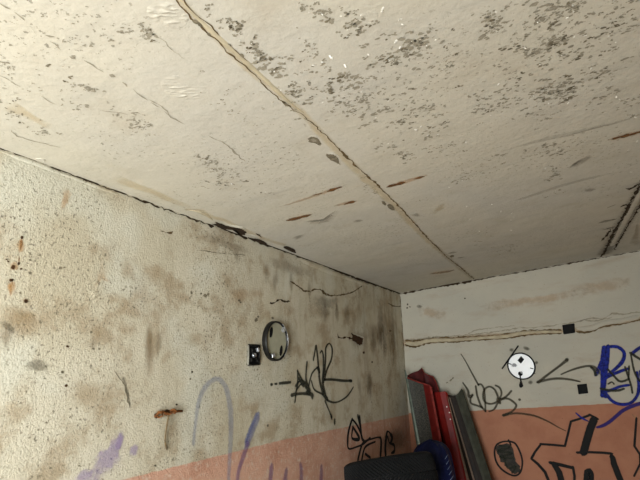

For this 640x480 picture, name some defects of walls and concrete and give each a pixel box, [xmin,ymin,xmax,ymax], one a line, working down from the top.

crack [46,35,181,123]
crack [0,131,214,228]
crack [176,0,640,354]
spalling [189,210,318,264]